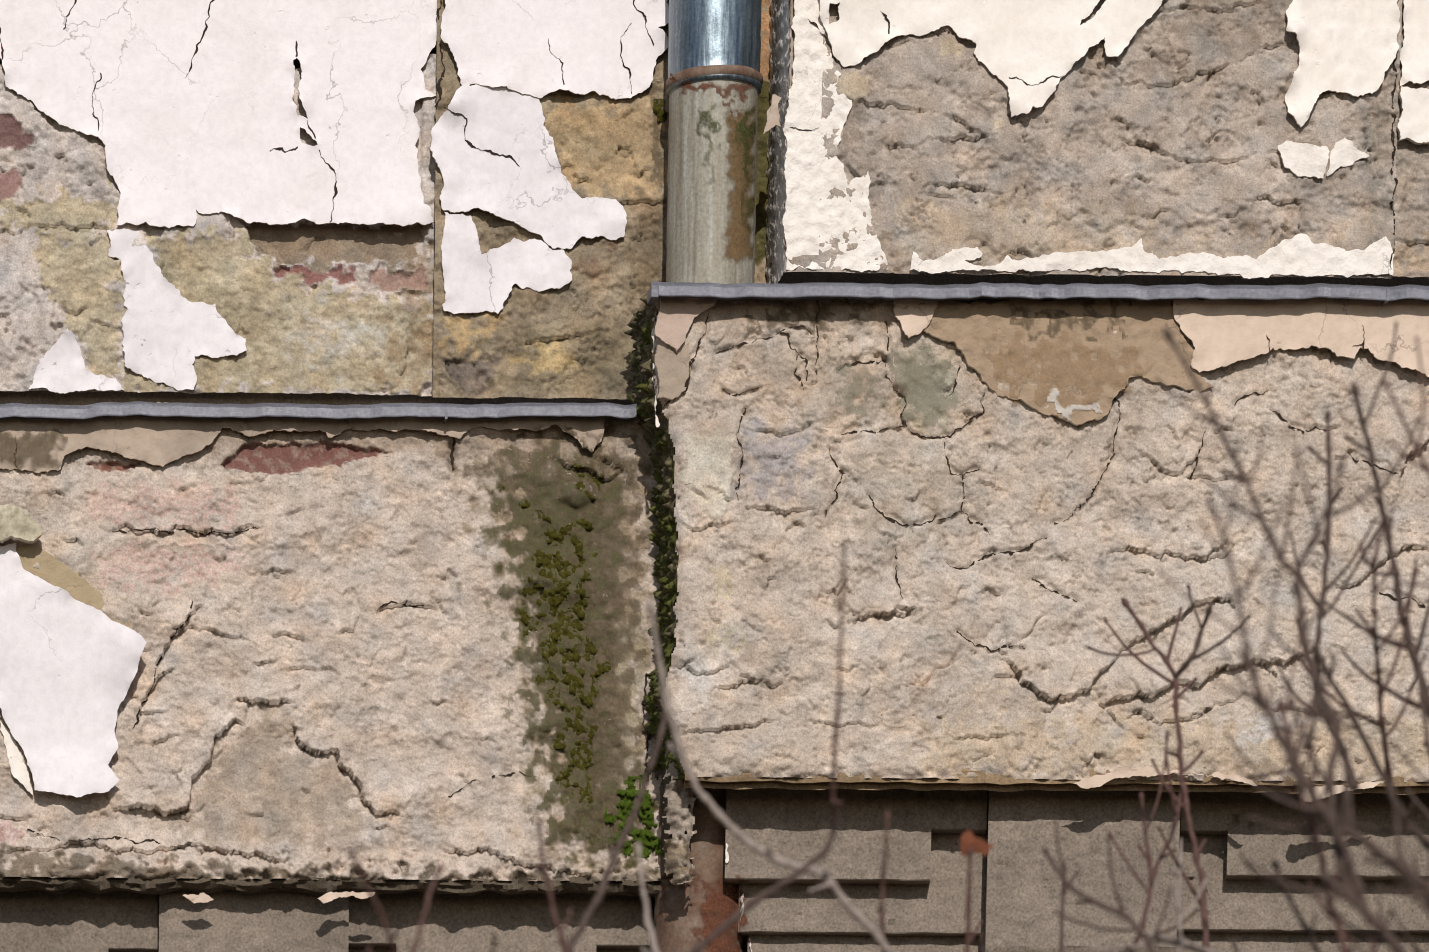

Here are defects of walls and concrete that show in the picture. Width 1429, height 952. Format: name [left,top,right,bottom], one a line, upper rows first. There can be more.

crack [185,0,214,78]
crack [270,121,338,225]
spalling [0,0,716,428]
crack [435,0,519,166]
rust [670,73,753,115]
spalling [784,0,1429,279]
peeling [893,299,1214,426]
spalling [223,440,393,475]
crack [664,300,1121,602]
peeling [0,543,147,798]
water stain [483,428,650,851]
rust [691,877,749,952]